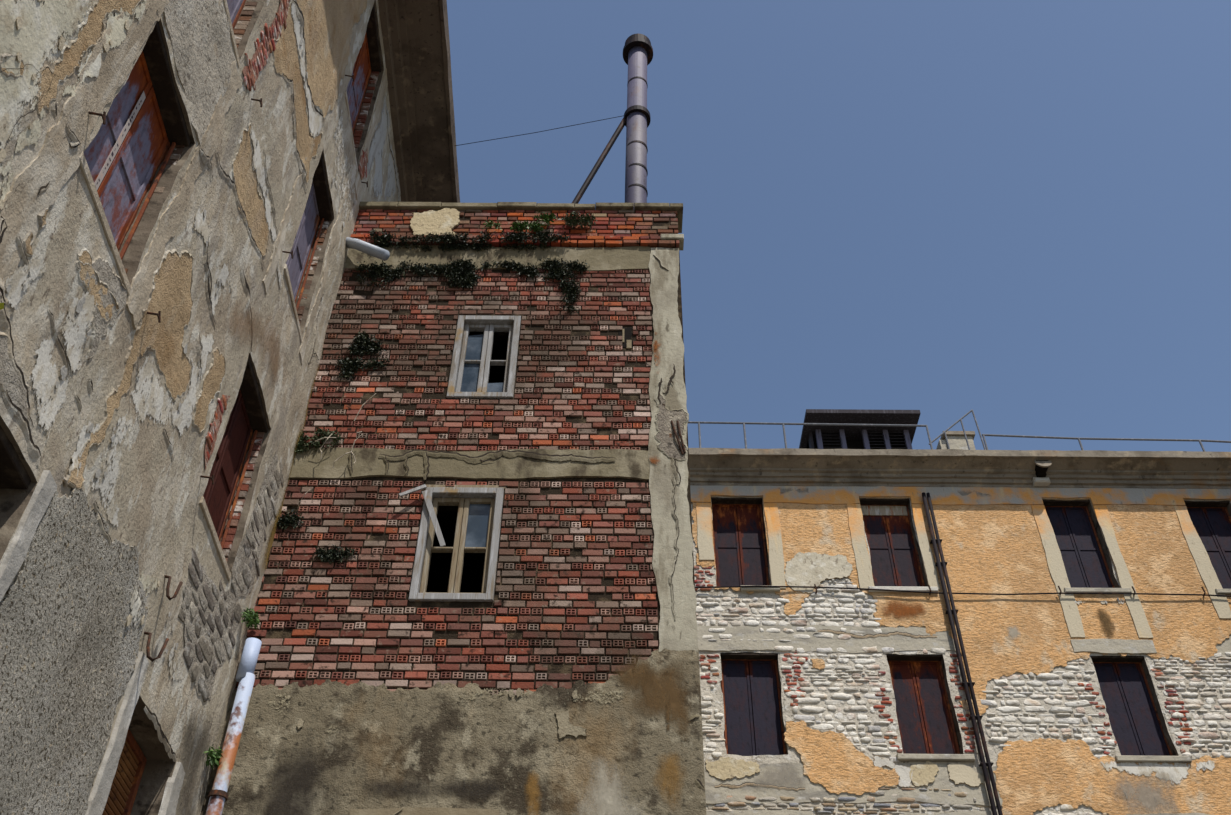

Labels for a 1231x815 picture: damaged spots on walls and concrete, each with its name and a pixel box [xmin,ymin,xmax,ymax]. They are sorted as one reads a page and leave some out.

peeling [0,0,147,210]
spalling [242,0,401,228]
spalling [232,123,284,290]
peeling [209,263,234,315]
spalling [63,249,230,527]
crack [654,364,676,405]
crack [669,459,681,620]
damp [620,660,688,730]
flaking render [694,565,1231,785]
damp [267,754,317,815]
damp [581,762,636,815]
flaking render [1036,804,1108,815]